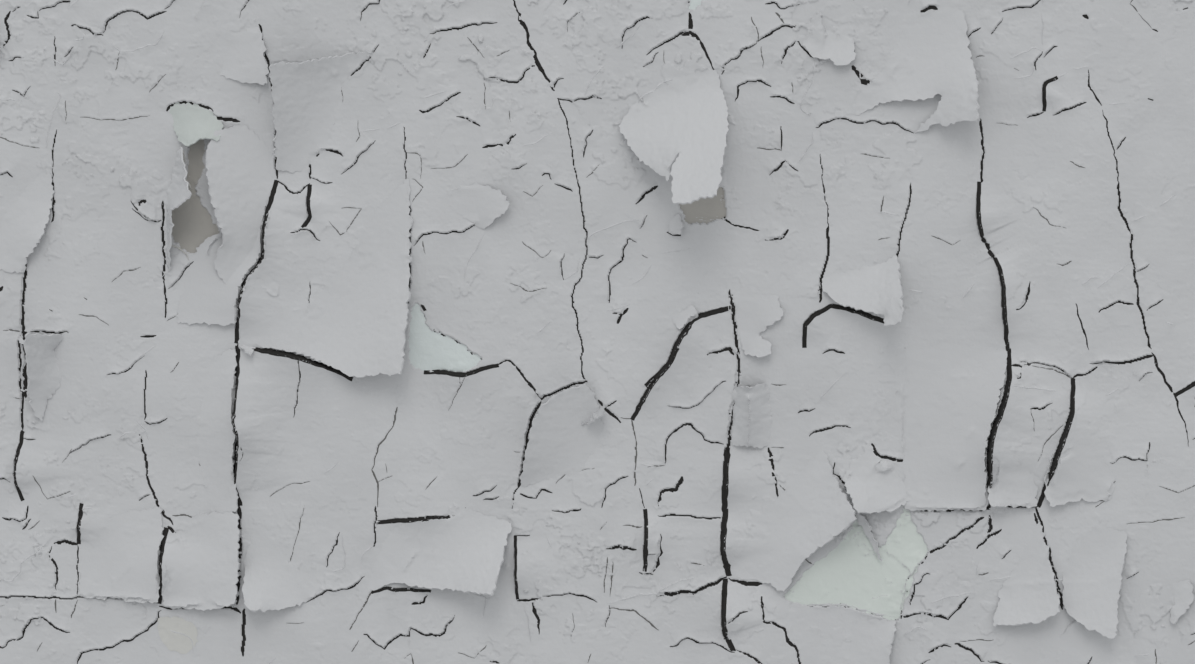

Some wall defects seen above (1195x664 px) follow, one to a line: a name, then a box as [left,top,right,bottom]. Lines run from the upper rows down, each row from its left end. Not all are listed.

crack [0,74,240,222]
peeling [619,25,856,236]
peeling [815,0,1040,133]
crack [0,264,122,618]
crack [139,362,192,610]
peeling [77,102,530,664]
crack [372,407,455,547]
peeling [519,384,605,499]
crack [403,0,801,664]
peeling [822,255,904,327]
peeling [730,342,1150,664]
crack [349,586,431,652]